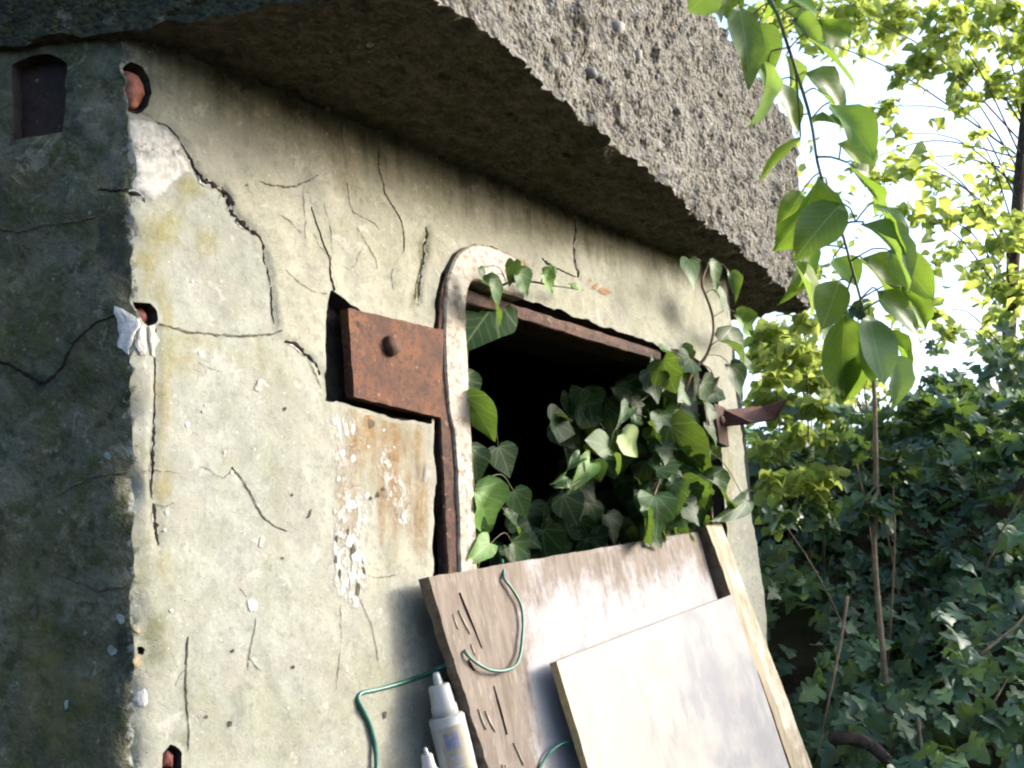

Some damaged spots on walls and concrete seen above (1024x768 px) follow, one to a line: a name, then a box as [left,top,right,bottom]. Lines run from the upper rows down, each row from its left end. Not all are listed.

crack [155,121,320,375]
crack [312,210,336,291]
crack [378,146,429,306]
crack [0,315,115,385]
crack [57,358,162,548]
crack [231,467,286,531]
spalling [324,290,432,608]